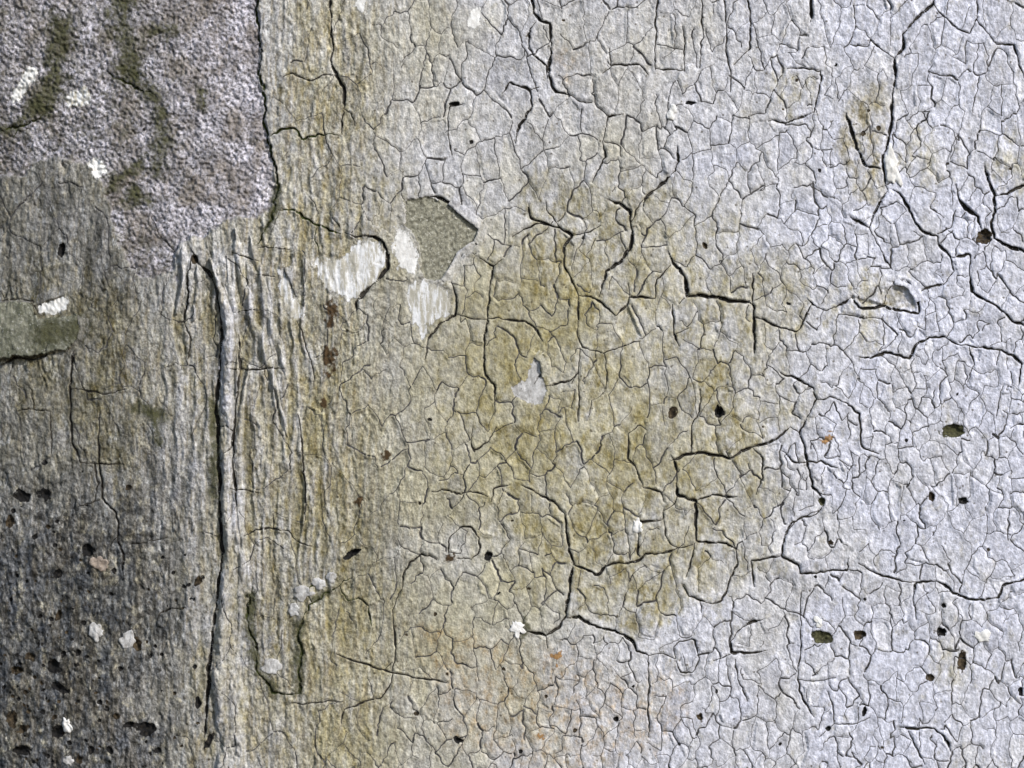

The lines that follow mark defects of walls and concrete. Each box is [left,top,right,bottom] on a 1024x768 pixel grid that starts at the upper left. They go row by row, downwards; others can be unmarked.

peeling [11,66,38,103]
peeling [65,85,91,109]
peeling [87,156,109,179]
spalling [312,196,488,340]
crack [0,170,172,590]
peeling [511,350,552,405]
crack [255,0,1024,768]
crack [160,249,385,768]